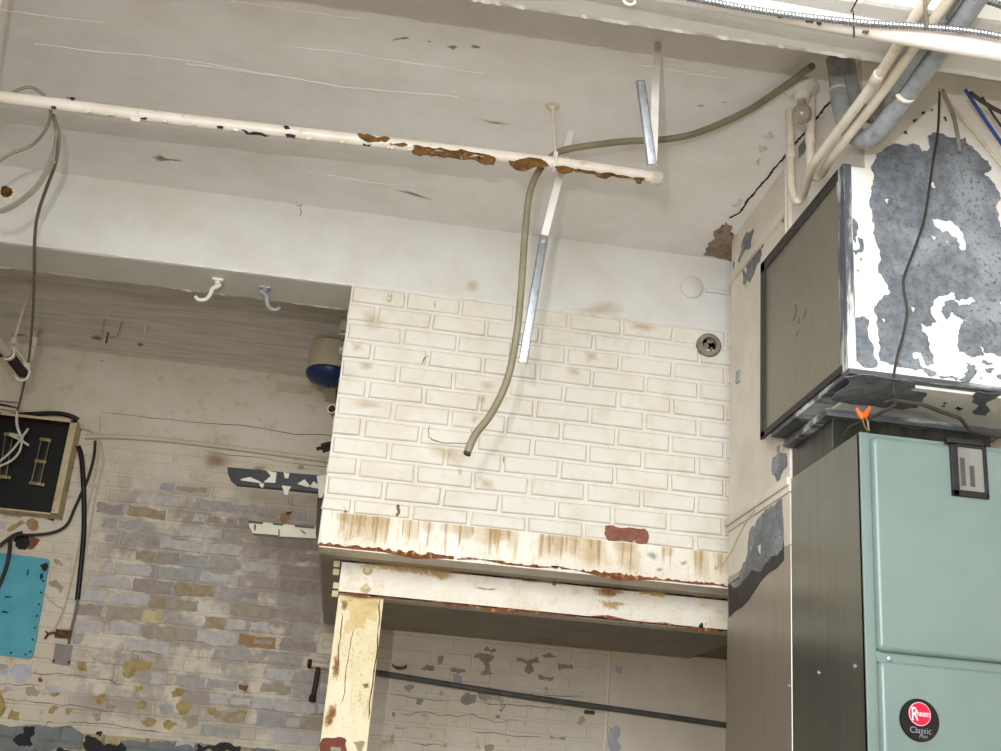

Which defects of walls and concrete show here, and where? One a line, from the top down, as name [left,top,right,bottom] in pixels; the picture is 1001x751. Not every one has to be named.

rust [358,133,495,159]
rust [509,157,549,171]
rust [573,168,646,180]
spalling [704,222,764,287]
peeling [831,109,1001,416]
peeling [241,470,327,498]
spalling [27,559,63,593]
peeling [71,483,365,751]
rust [319,542,728,632]
peeling [731,499,784,588]
peeling [0,664,84,751]
spalling [420,647,497,705]